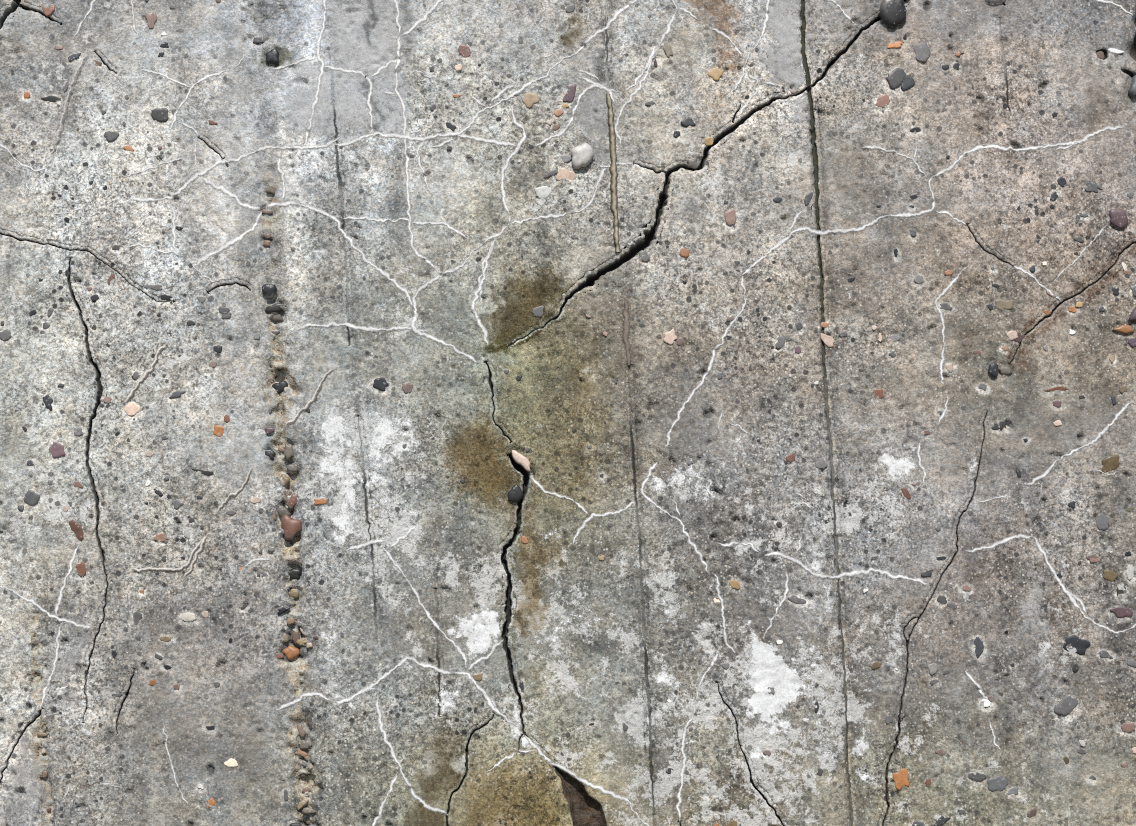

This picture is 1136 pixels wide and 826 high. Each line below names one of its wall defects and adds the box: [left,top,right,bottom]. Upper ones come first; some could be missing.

crack [1097,0,1132,14]
crack [0,0,138,214]
crack [666,126,1136,446]
crack [125,0,882,826]
crack [0,228,207,810]
water stain [447,604,500,668]
water stain [537,608,602,656]
crack [718,403,1136,826]
water stain [430,682,458,728]
water stain [511,702,532,751]
spalling [549,764,607,826]